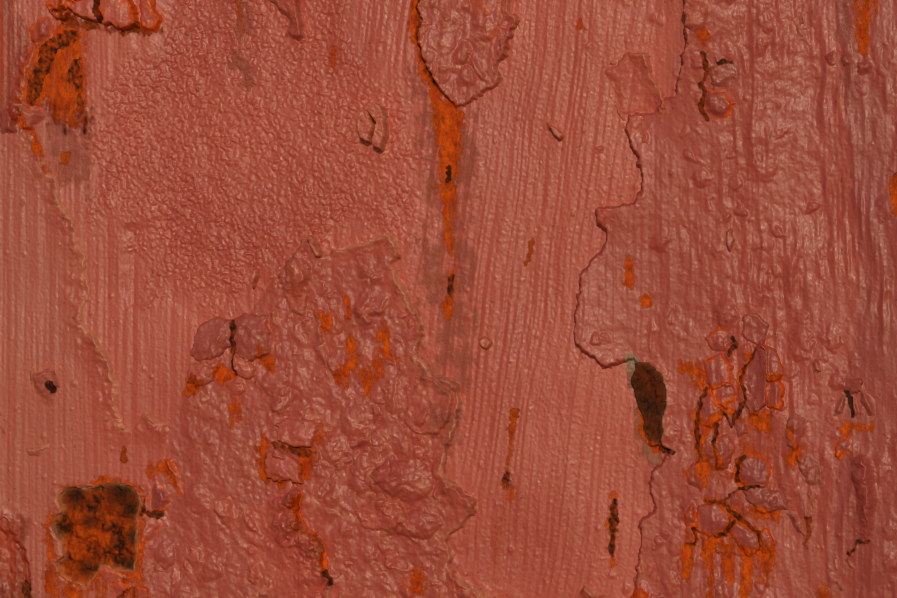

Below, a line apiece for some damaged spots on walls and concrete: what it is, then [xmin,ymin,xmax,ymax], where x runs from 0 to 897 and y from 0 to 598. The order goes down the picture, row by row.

corrosion [6,22,88,128]
peeling [29,0,163,47]
peeling [268,0,306,42]
peeling [357,104,390,152]
peeling [408,0,521,113]
corrosion [852,0,878,55]
corrosion [408,66,480,386]
peeling [573,0,880,598]
peeling [51,231,497,598]
corrosion [637,408,660,453]
peeling [21,580,32,598]
corrosion [42,475,145,598]